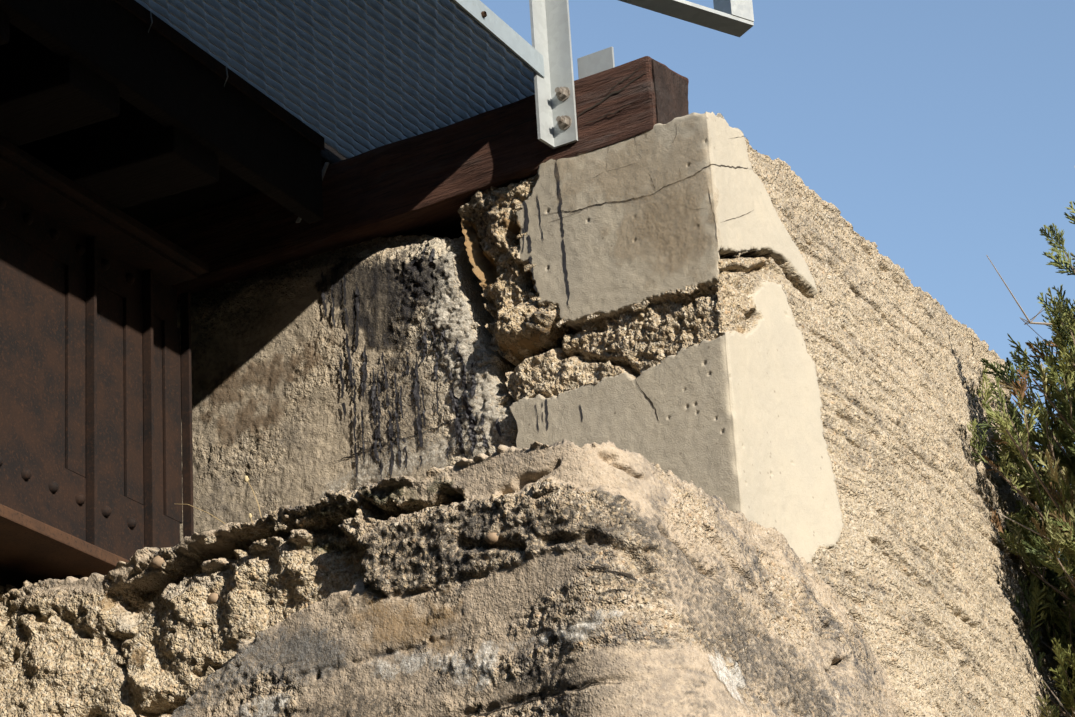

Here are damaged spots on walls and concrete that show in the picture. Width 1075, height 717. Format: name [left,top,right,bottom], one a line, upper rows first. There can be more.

crack [540,136,788,280]
water stain [321,198,524,496]
water stain [500,311,572,361]
spalling [438,183,775,450]
crack [636,373,659,421]
spalling [0,495,443,717]
crack [465,682,612,717]